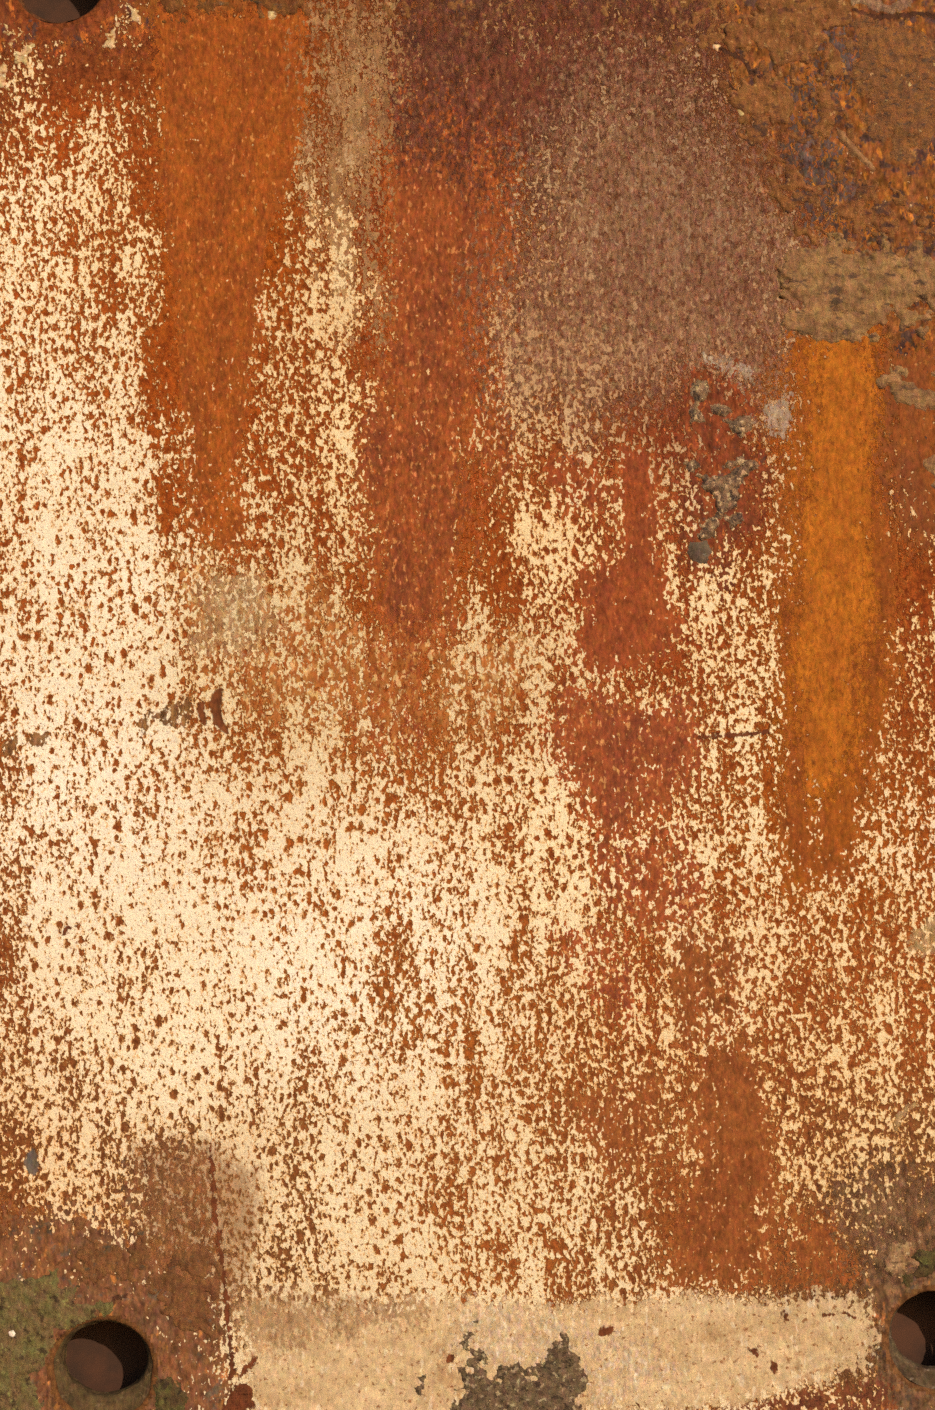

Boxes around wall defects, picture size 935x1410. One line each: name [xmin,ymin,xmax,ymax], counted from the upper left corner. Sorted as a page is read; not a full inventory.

peeling [0,22,35,91]
corrosion [0,0,763,776]
spalling [197,688,228,734]
corrosion [526,300,935,1410]
corrosion [0,1125,258,1410]
peeling [55,1217,225,1363]
peeling [439,1292,691,1410]
spalling [748,1348,778,1373]
peeling [761,1389,903,1410]